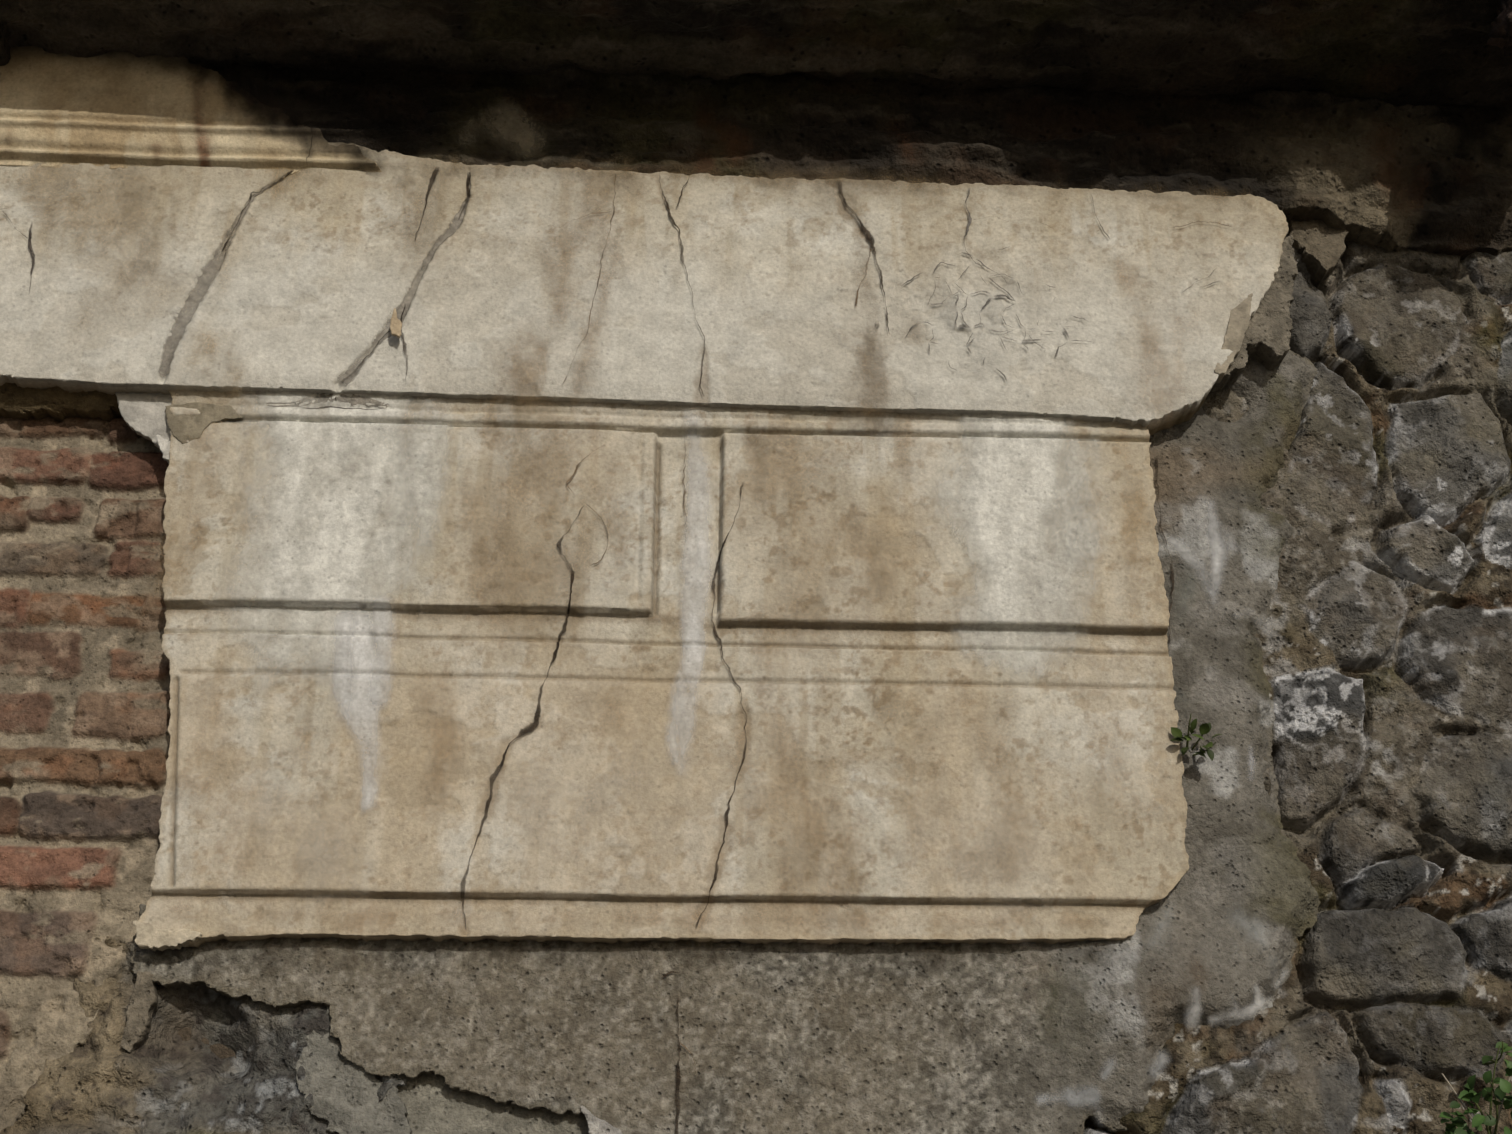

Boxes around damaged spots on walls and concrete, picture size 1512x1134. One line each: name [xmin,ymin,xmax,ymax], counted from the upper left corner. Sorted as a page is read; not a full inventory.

crack [4,212,35,290]
crack [159,128,313,376]
crack [268,169,471,410]
crack [563,176,616,383]
crack [659,178,705,394]
crack [838,183,1091,380]
water stain [238,391,445,807]
crack [461,445,608,928]
water stain [672,418,708,748]
crack [683,440,747,926]
spalling [0,921,622,1134]